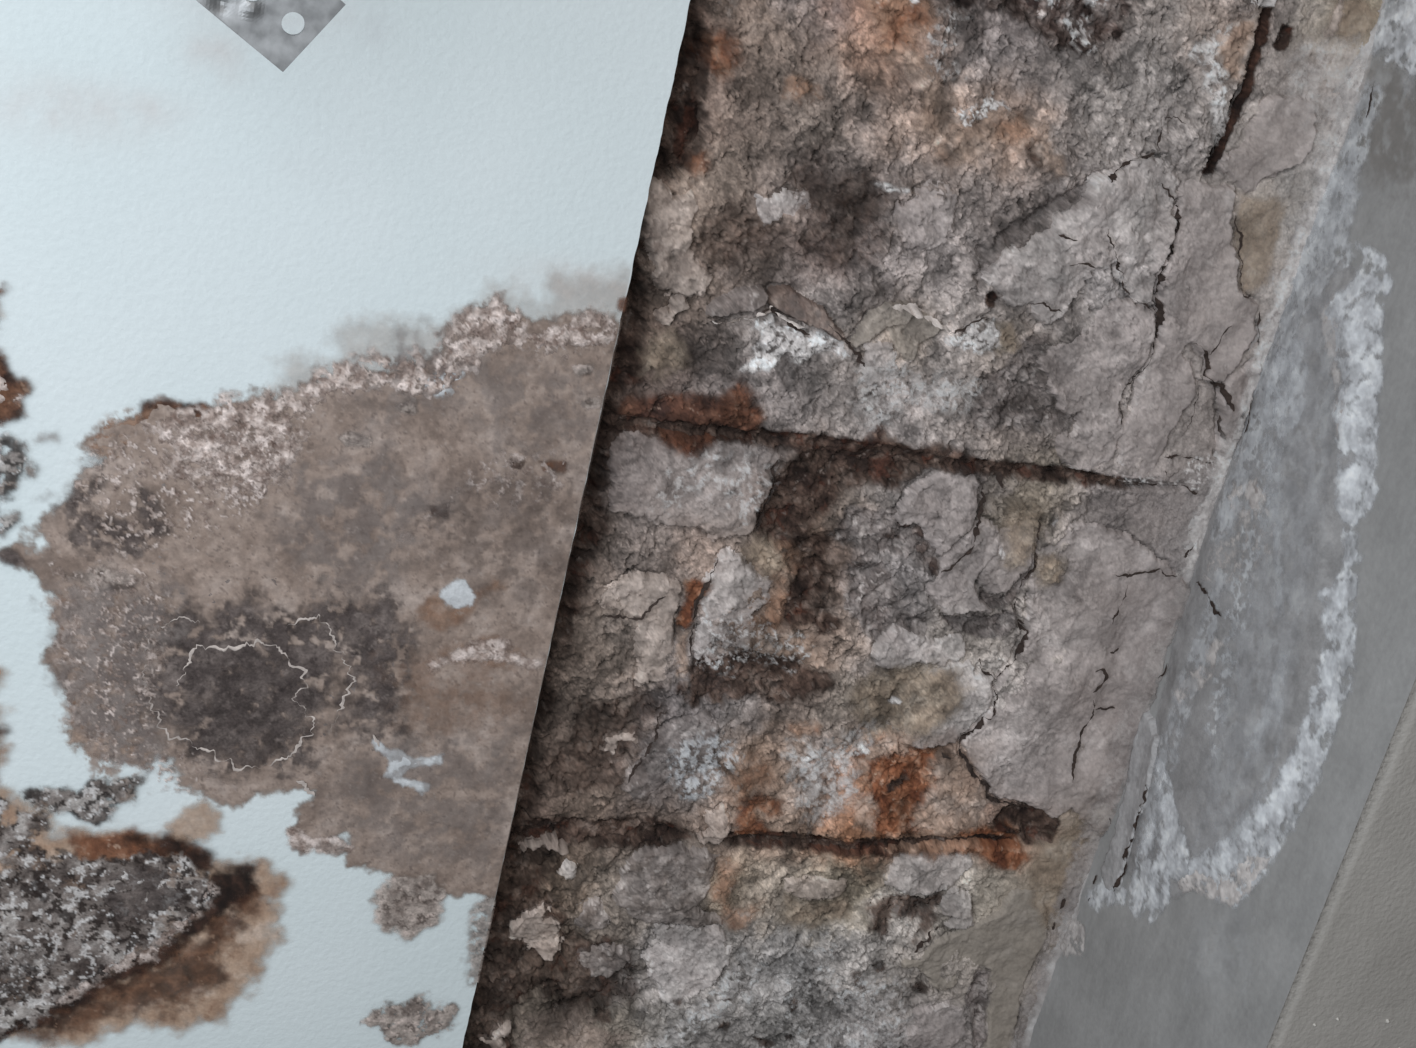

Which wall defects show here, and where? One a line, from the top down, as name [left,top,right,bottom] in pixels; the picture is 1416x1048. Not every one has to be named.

water stain [0,294,619,985]
crack [603,557,718,653]
rust [620,383,764,455]
crack [761,307,865,367]
rust [865,425,966,465]
crack [942,518,1041,805]
crack [941,216,1261,573]
crack [1059,116,1186,425]
crack [1071,546,1221,780]
water stain [1006,69,1393,1048]
rust [727,754,784,848]
rust [805,730,1028,870]